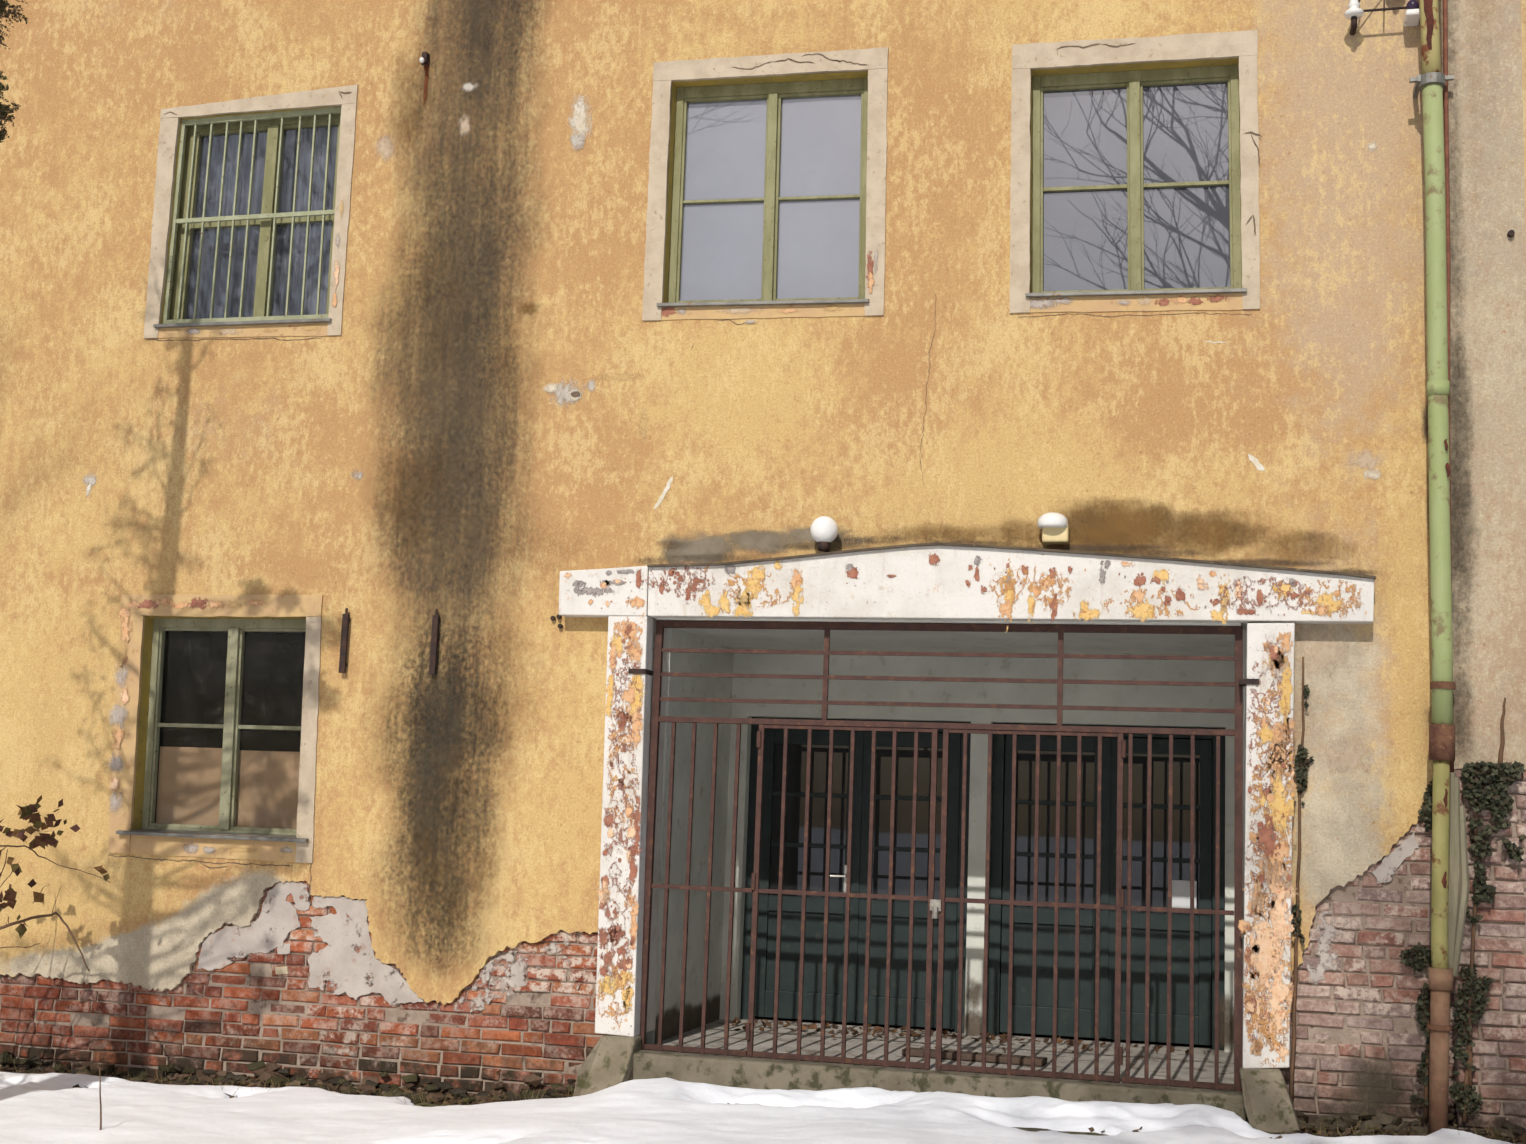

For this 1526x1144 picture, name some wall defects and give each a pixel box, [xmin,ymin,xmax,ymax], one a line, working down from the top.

leakage [378,0,534,923]
spalling [544,373,638,406]
leakage [650,528,870,564]
peeling [845,564,860,579]
leakage [922,501,1320,565]
spalling [0,560,803,1095]
spalling [965,555,1432,1127]
spalling [1448,769,1526,1132]